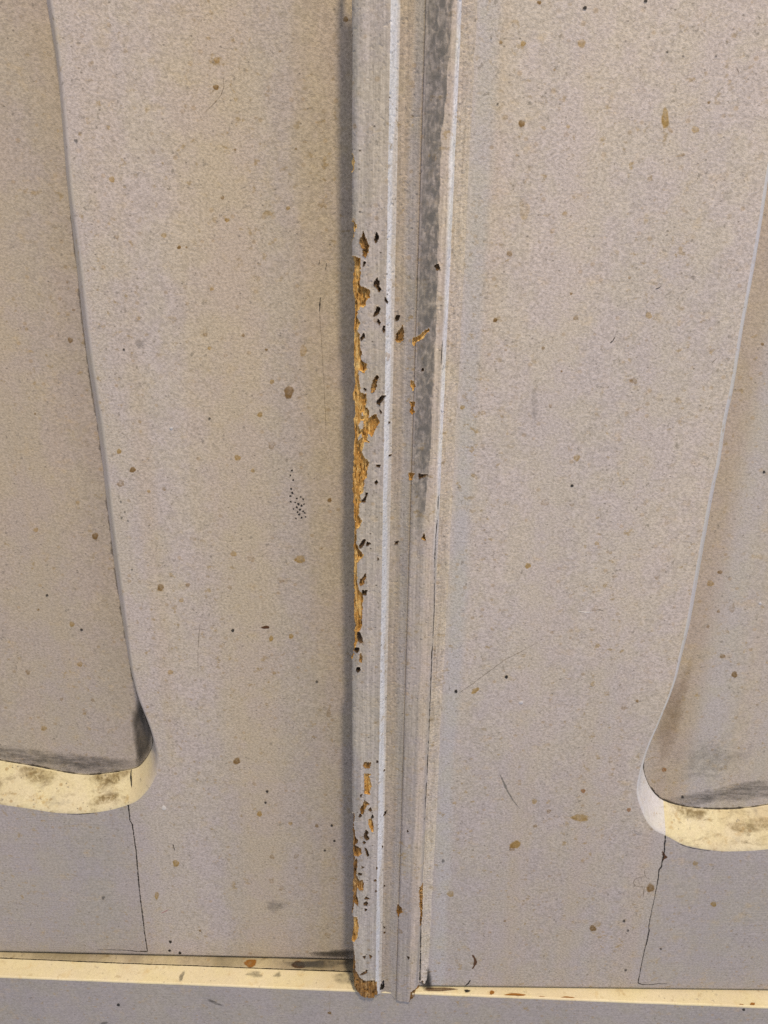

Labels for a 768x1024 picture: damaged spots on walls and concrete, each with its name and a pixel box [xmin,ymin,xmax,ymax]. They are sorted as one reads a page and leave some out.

peeling [351,220,430,673]
crack [0,769,351,972]
peeling [352,760,386,998]
crack [632,835,709,985]